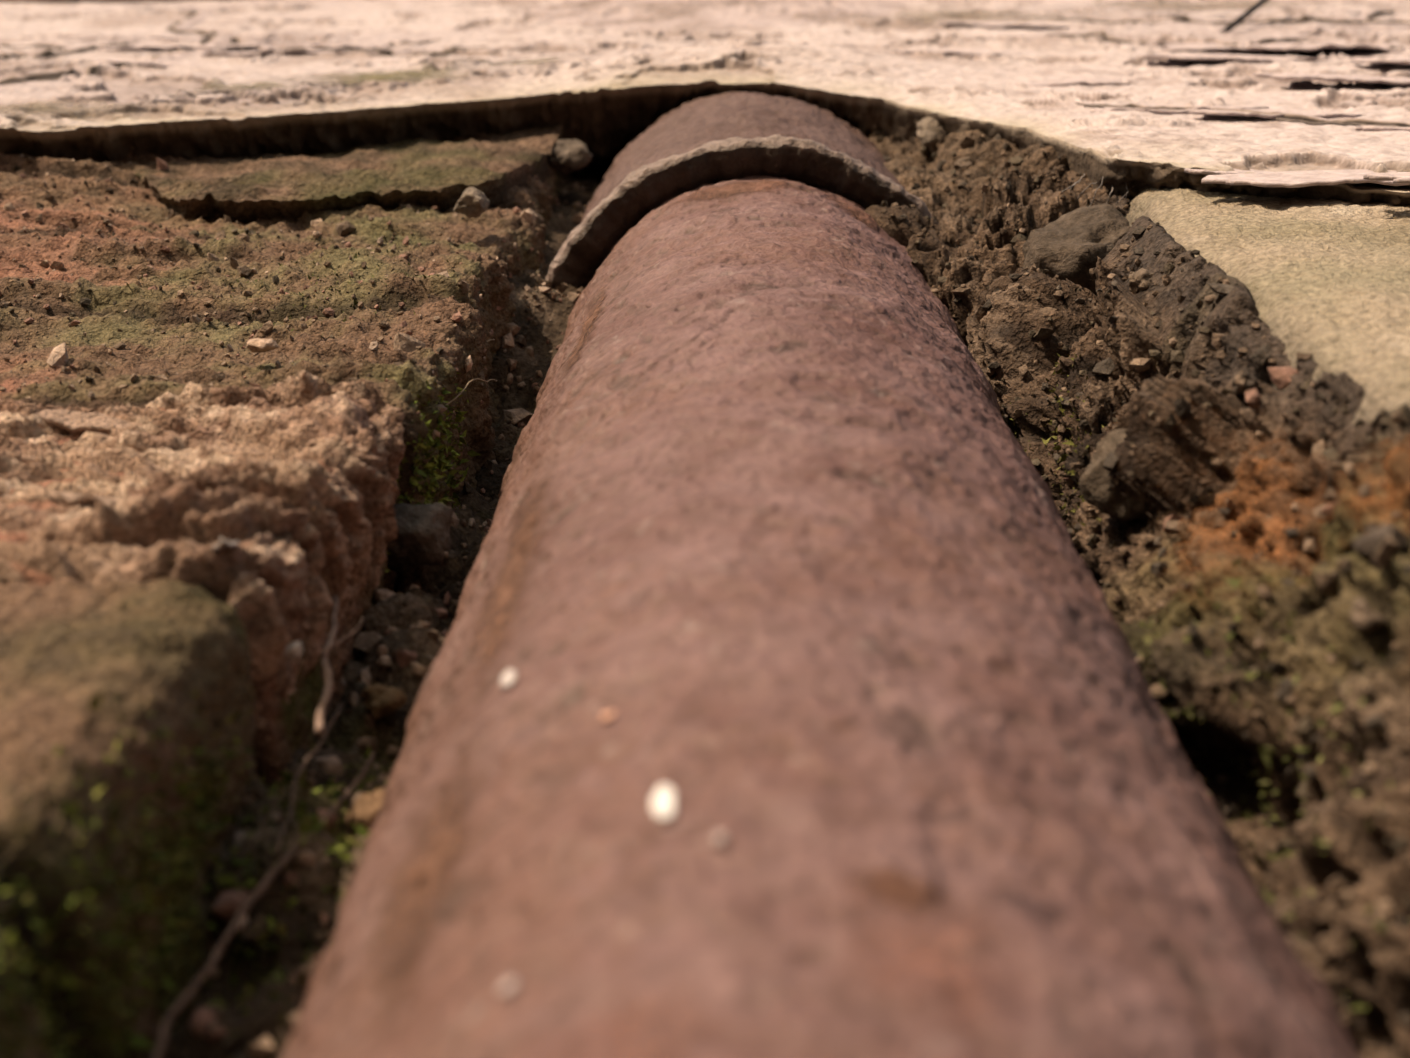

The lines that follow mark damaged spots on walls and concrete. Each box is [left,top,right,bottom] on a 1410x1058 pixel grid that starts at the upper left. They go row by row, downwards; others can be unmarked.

crack [1022,9,1410,57]
crack [1076,102,1410,127]